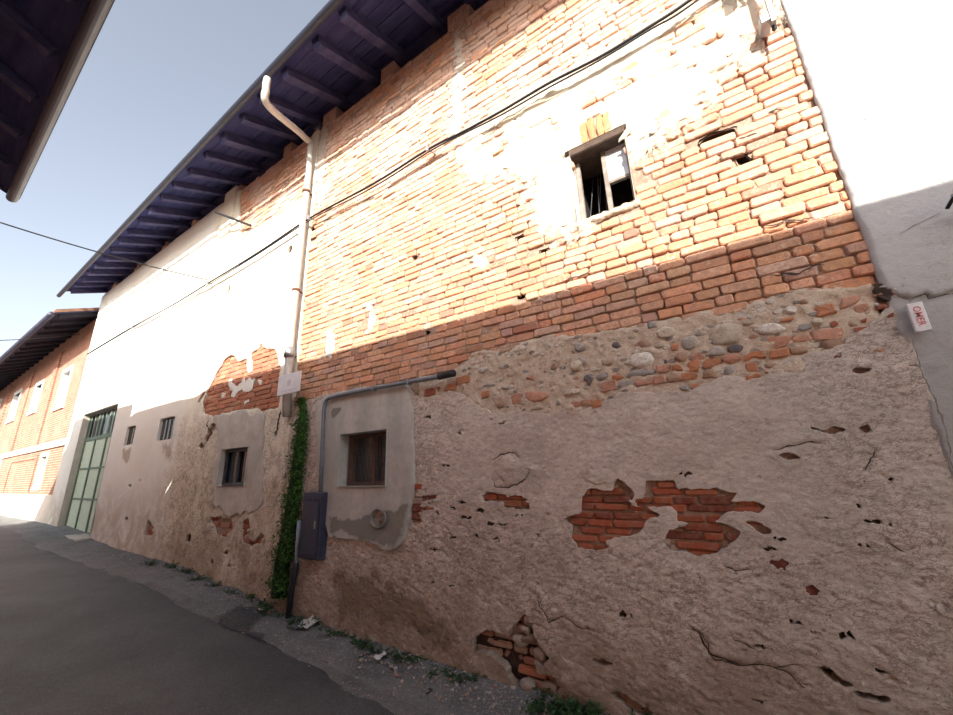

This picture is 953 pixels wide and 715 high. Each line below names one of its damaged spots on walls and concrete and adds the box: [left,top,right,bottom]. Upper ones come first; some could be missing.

flaking render [450,0,782,258]
flaking render [221,356,262,405]
flaking render [418,278,906,425]
flaking render [206,517,266,546]
flaking render [411,483,440,525]
flaking render [451,494,530,542]
flaking render [570,470,764,556]
spalling [476,615,560,695]
crack [687,628,876,696]